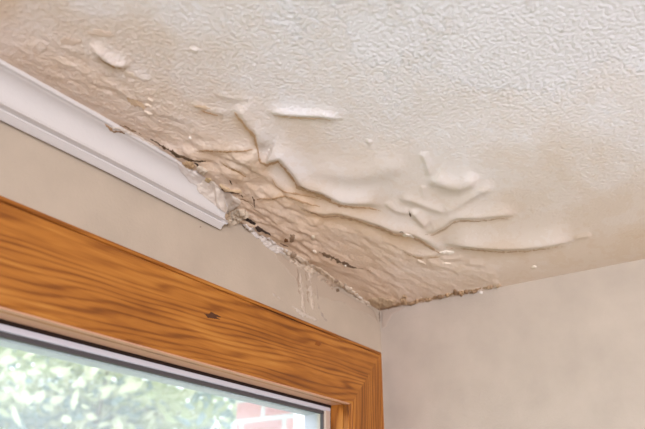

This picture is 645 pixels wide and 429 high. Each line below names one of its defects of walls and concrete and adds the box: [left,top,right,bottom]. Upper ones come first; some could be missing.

spalling [0,34,506,311]
crack [320,252,371,271]
water stain [274,251,494,327]